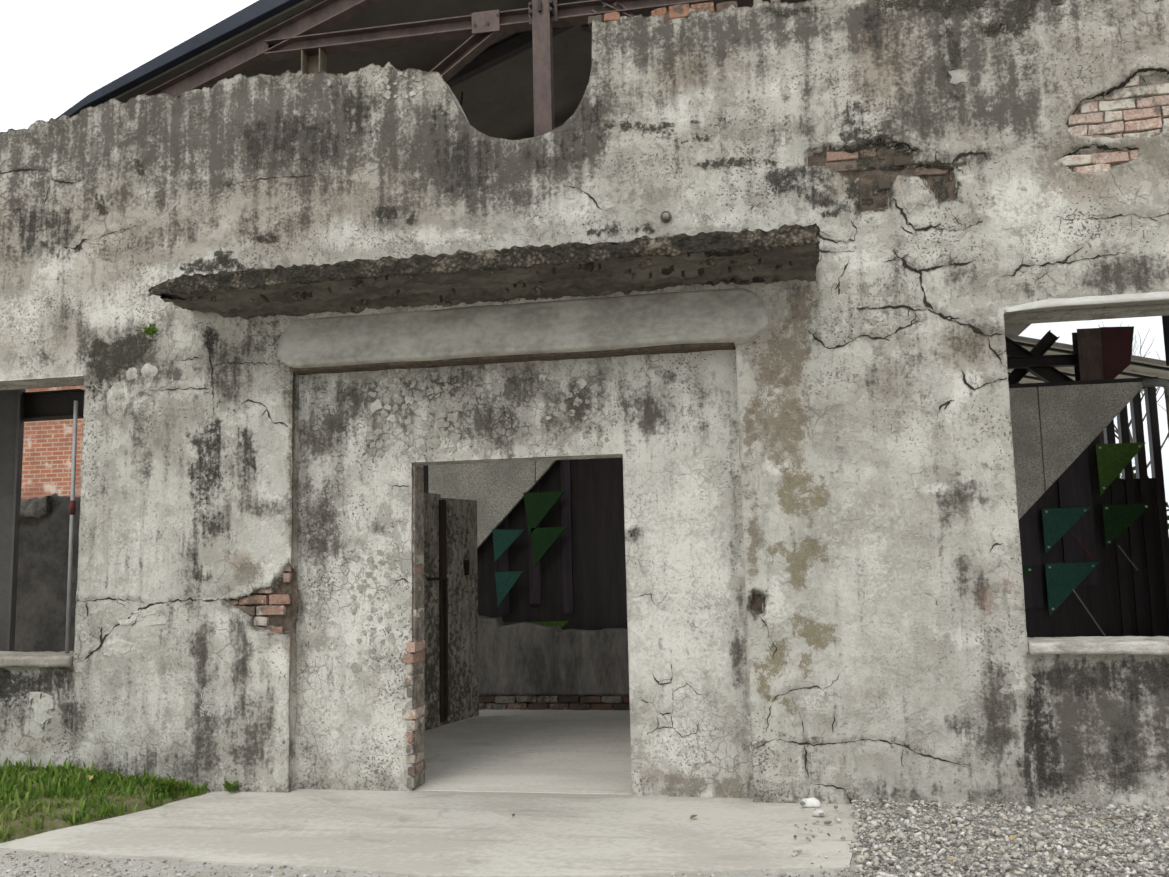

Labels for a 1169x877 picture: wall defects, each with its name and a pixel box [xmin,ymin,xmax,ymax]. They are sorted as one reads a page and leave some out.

water stain [243,83,377,168]
water stain [430,106,498,200]
spalling [808,140,958,213]
spalling [1058,72,1169,174]
water stain [11,197,83,259]
crack [999,209,1169,282]
crack [809,199,1007,419]
crack [76,586,271,662]
spalling [229,566,334,634]
spalling [350,467,426,788]
crack [757,675,968,804]
water stain [1016,659,1169,798]